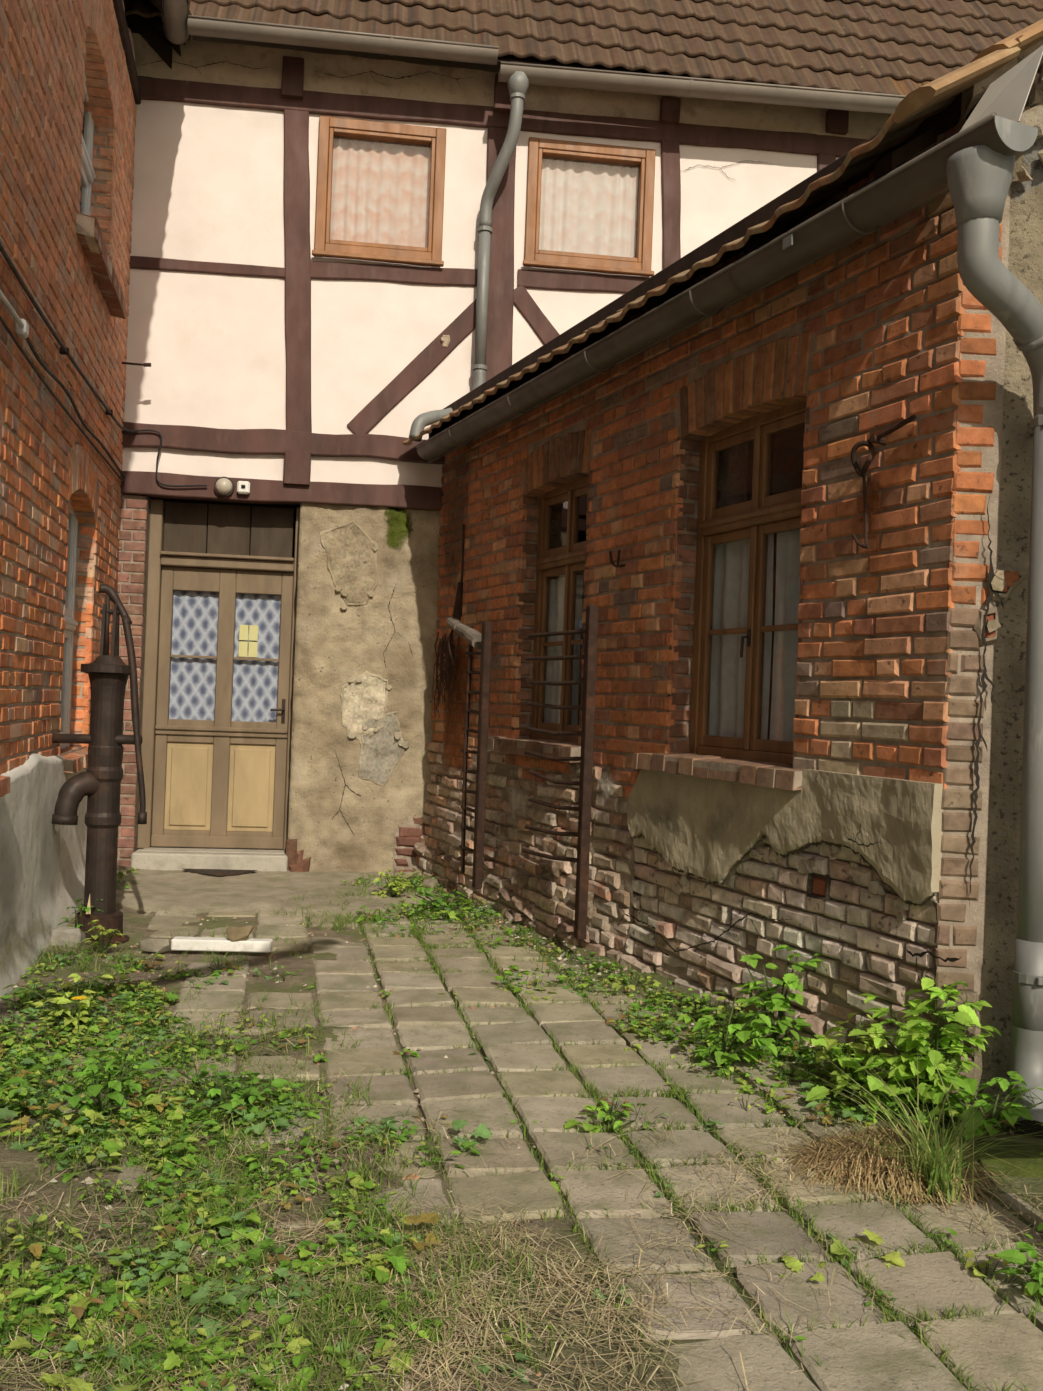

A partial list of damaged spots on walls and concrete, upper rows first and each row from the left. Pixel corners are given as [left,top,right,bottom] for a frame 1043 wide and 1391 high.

spalling [1016,64,1043,182]
crack [968,497,1004,906]
spalling [620,834,939,1092]